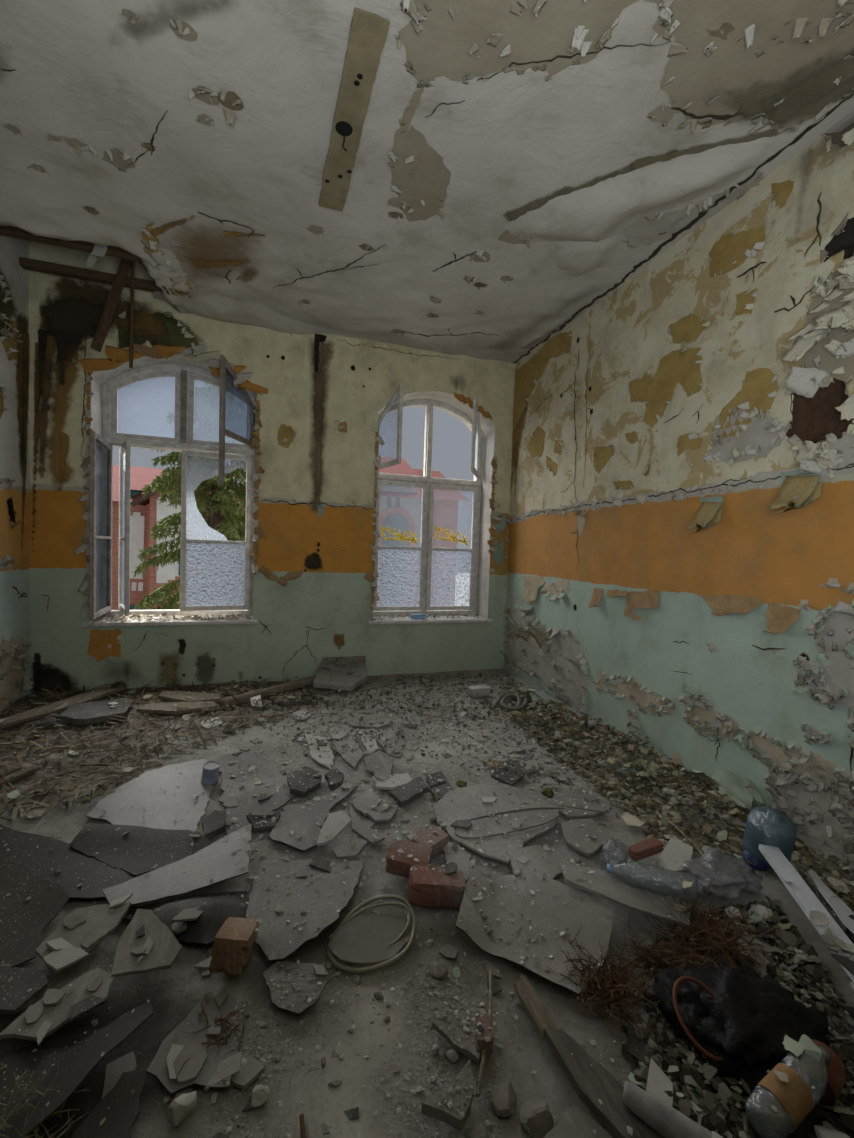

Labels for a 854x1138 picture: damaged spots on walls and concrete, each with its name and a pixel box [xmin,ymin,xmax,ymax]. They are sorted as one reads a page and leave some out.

peeling [169,19,198,41]
crack [425,41,671,118]
peeling [189,86,244,128]
peeling [387,0,854,222]
peeling [46,134,157,173]
crack [512,94,854,364]
crack [272,244,386,289]
crack [433,251,476,272]
peeling [0,275,23,365]
crack [340,328,498,359]
crack [511,341,854,569]
peeling [87,629,124,663]